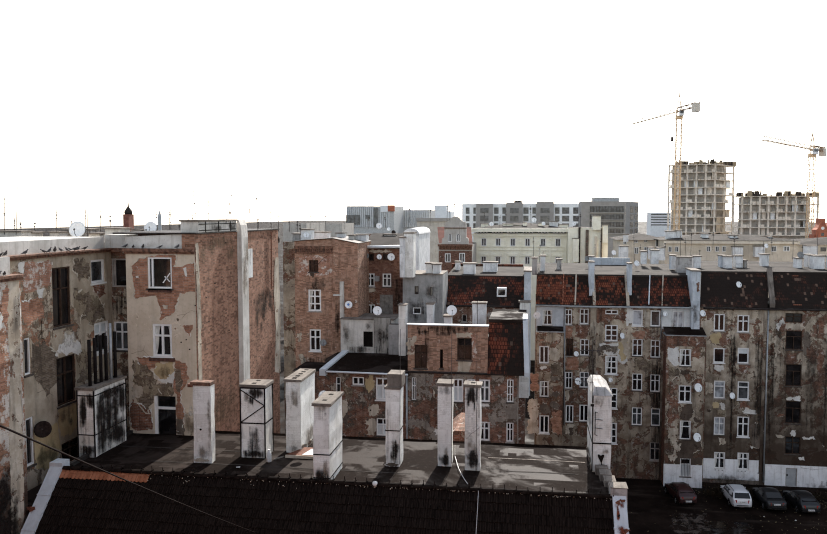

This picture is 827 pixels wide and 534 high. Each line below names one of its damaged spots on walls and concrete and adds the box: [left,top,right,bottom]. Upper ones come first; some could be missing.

flaking render [0,286,10,329]
flaking render [19,259,53,326]
flaking render [72,258,106,326]
flaking render [132,254,210,350]
flaking render [536,308,627,344]
flaking render [597,340,622,356]
flaking render [129,356,162,431]
flaking render [167,360,189,435]
flaking render [669,366,712,393]
flaking render [680,404,701,423]
flaking render [668,427,703,466]
rust [615,499,631,534]